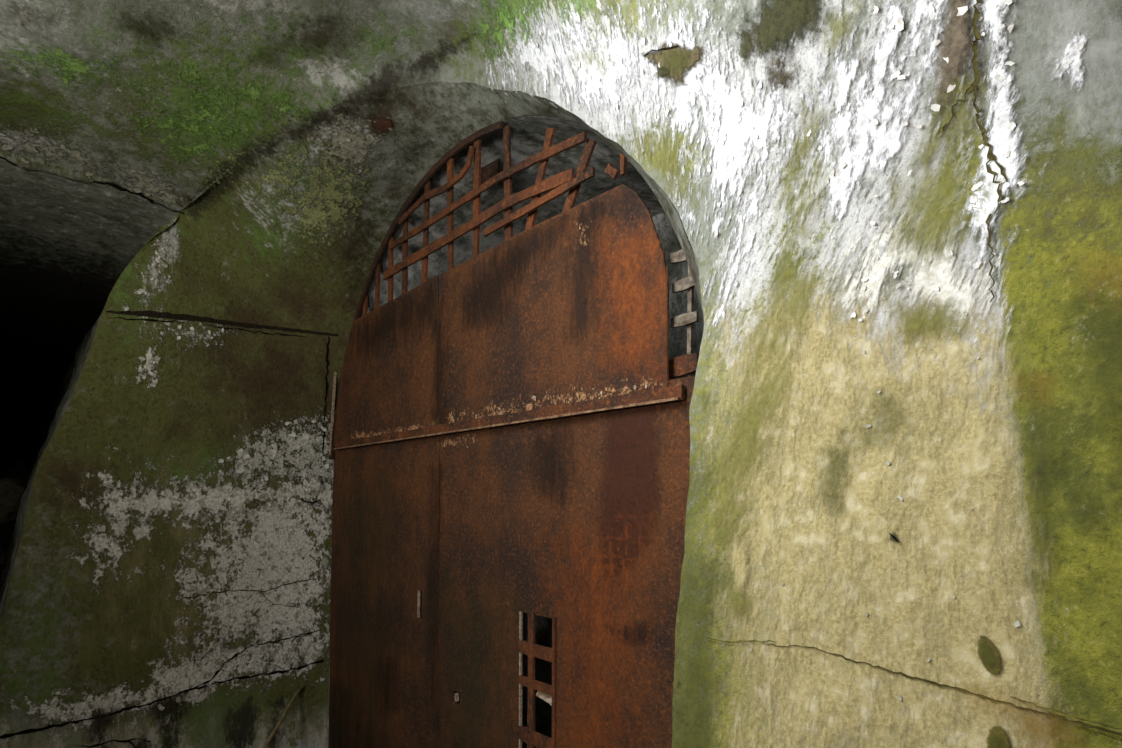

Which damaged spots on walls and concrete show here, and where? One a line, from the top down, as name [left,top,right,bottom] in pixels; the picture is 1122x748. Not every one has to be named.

crack [0,156,184,215]
leakage [736,0,846,91]
leakage [919,0,978,163]
crack [940,0,1008,302]
crack [61,310,338,453]
peeling [477,0,1049,748]
leakage [903,308,955,336]
peeling [4,406,334,743]
leakage [133,692,187,748]
crack [0,578,324,748]
crack [706,638,1122,742]